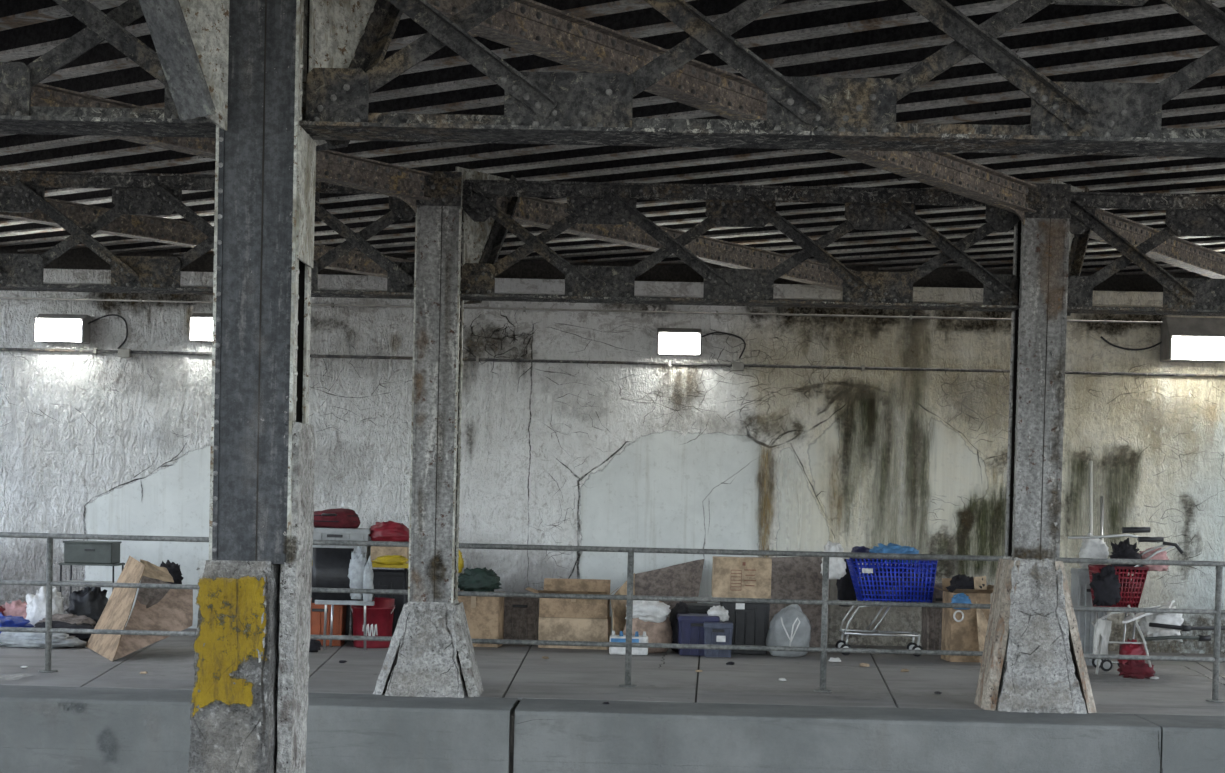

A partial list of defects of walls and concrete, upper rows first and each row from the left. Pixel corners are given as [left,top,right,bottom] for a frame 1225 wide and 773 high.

crack [2,353,122,455]
crack [83,430,190,534]
crack [463,305,884,589]
water stain [743,299,1008,576]
water stain [1066,461,1086,535]
peeling [190,567,274,722]